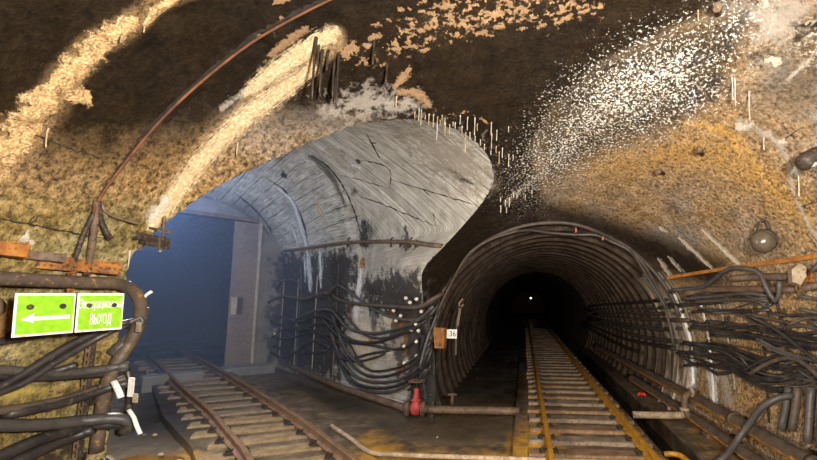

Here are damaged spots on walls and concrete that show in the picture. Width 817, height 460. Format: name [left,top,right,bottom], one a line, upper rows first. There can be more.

crack [315,135,477,234]
peeling [320,0,609,128]
water stain [489,0,817,255]
water stain [263,186,444,427]